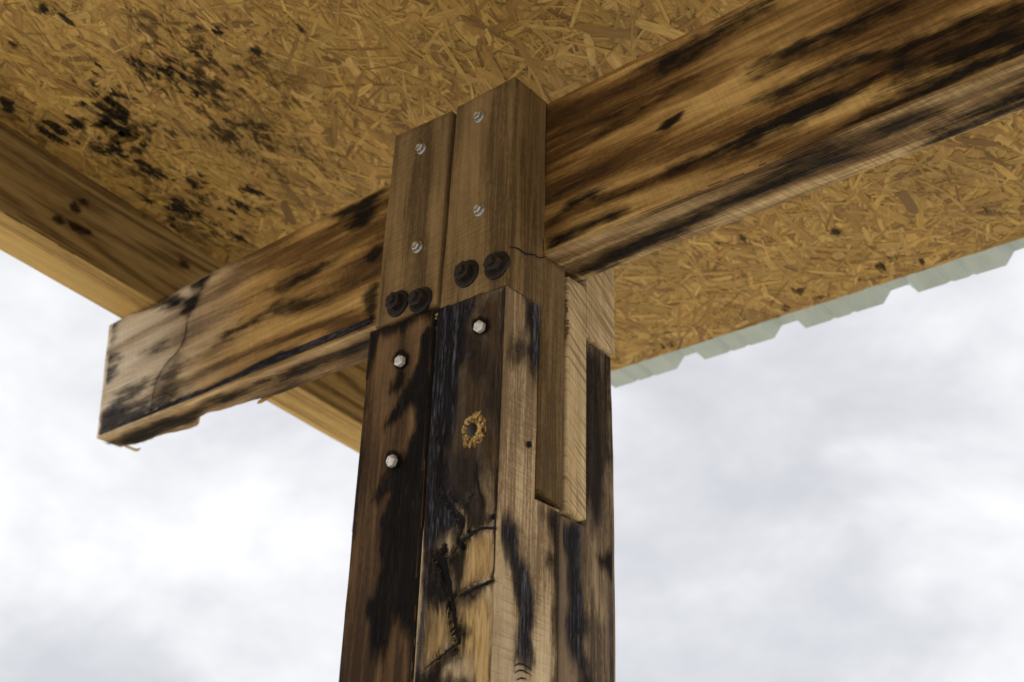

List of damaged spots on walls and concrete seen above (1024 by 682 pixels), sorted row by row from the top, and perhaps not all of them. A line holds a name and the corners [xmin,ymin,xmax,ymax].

damp [35,1,75,26]
damp [0,25,292,246]
crack [150,286,203,419]
crack [422,411,496,671]